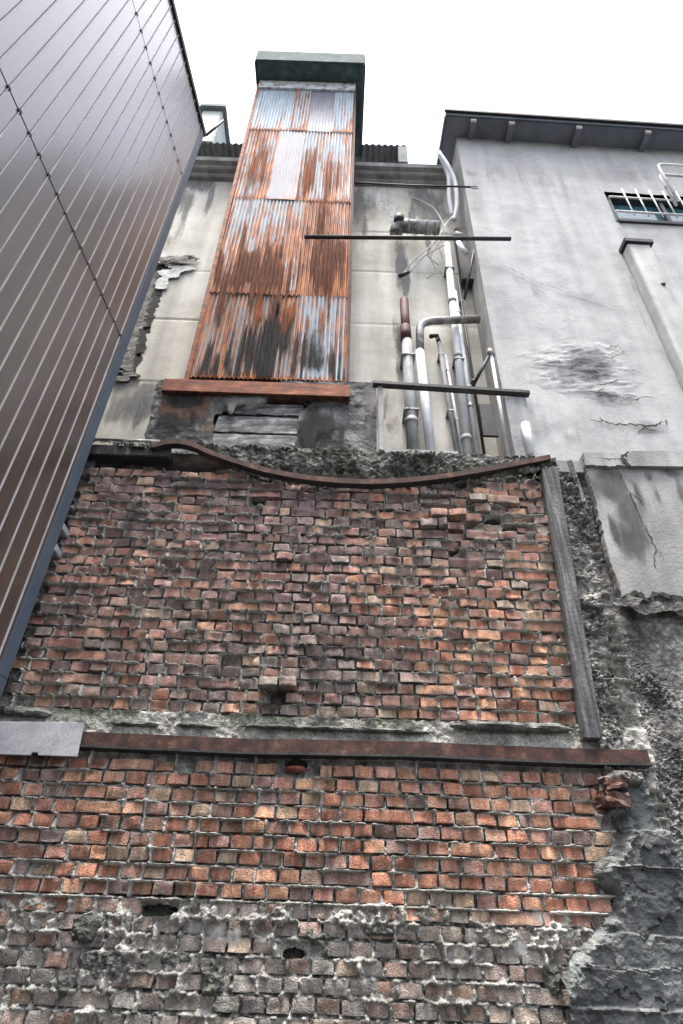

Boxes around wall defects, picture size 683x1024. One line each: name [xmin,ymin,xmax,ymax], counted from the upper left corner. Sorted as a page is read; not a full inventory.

rust [210,125,349,337]
spalling [115,255,200,383]
crack [590,418,667,567]
spalling [612,590,683,616]
spalling [594,776,631,810]
spalling [142,903,179,917]
spalling [283,947,305,959]